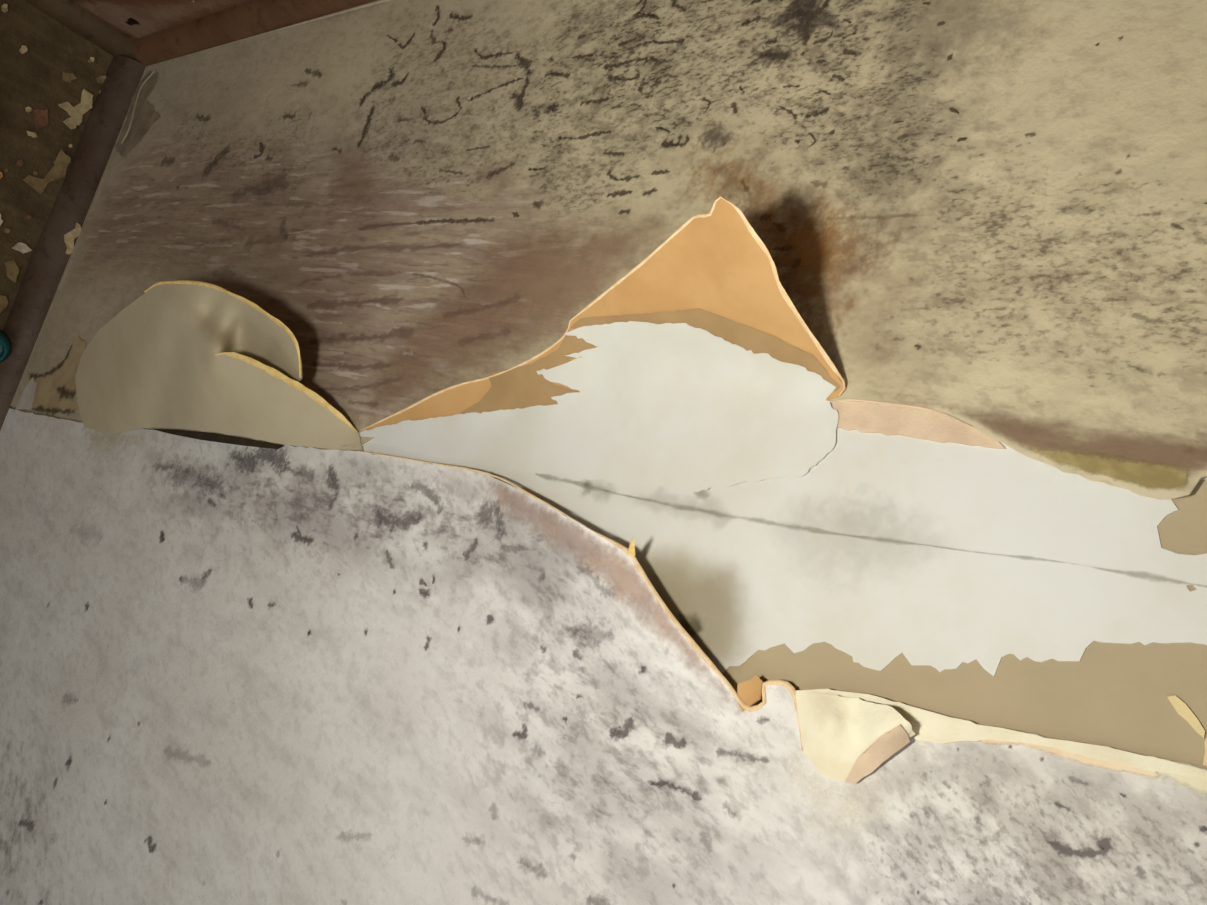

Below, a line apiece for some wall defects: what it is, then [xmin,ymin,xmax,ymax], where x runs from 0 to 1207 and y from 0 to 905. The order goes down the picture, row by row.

leakage [430,6,472,61]
leakage [357,69,408,147]
leakage [421,49,569,124]
leakage [572,0,967,195]
leakage [607,170,669,214]
leakage [360,218,493,230]
leakage [267,468,338,544]
leakage [368,497,421,538]
leakage [682,618,700,634]
leakage [610,717,633,739]
leakage [665,733,686,748]
leakage [651,781,701,801]